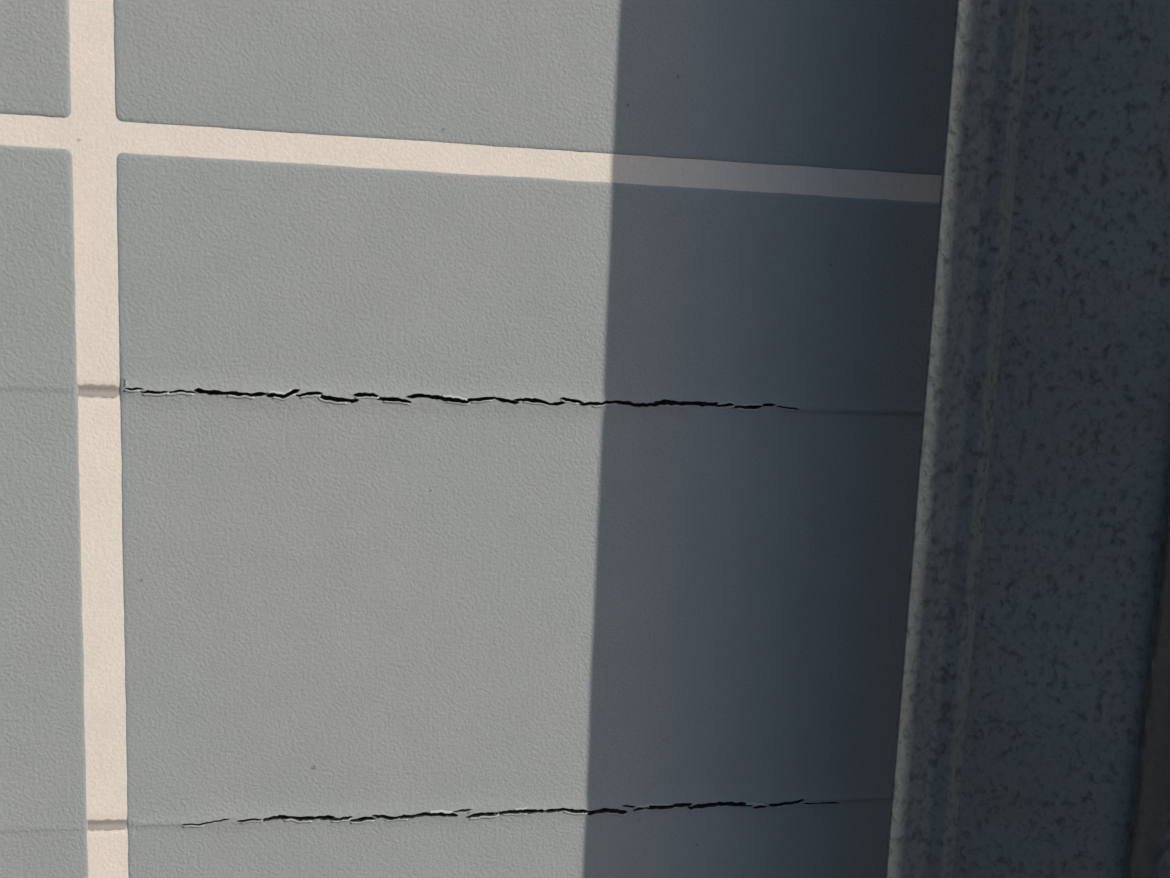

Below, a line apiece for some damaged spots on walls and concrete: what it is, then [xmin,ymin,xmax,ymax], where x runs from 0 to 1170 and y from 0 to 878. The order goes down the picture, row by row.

crack [124,387,800,412]
crack [182,799,839,828]